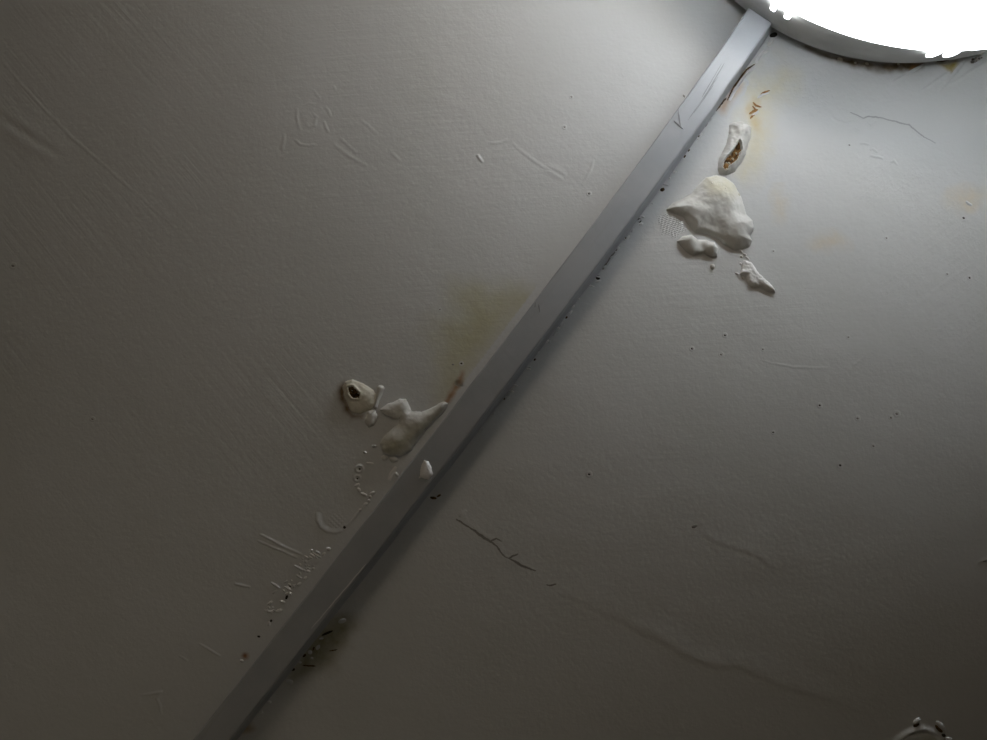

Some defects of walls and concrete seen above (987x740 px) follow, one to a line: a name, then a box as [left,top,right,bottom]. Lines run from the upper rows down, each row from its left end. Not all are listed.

crack [456,509,556,586]